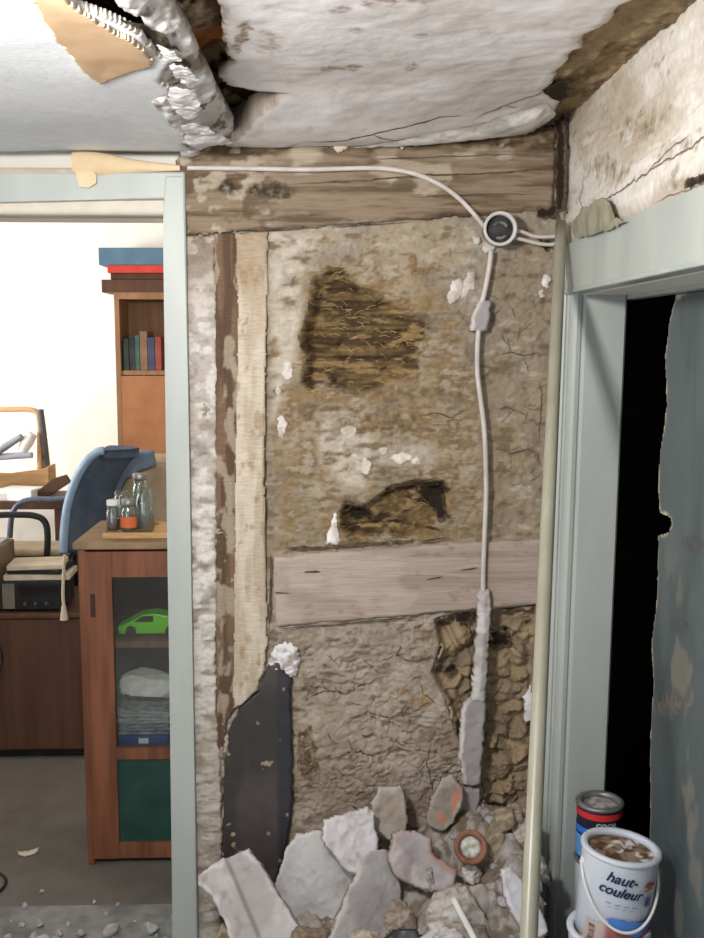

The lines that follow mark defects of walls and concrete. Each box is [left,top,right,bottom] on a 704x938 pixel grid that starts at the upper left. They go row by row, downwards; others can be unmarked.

peeling [155,44,233,159]
spalling [179,0,258,108]
crack [245,220,402,231]
crack [270,116,552,198]
spalling [536,0,697,219]
crack [605,133,704,199]
crack [654,182,704,203]
spalling [275,265,430,396]
spalling [326,478,454,545]
crack [298,646,436,808]
spalling [432,610,477,733]
spalling [481,605,536,808]